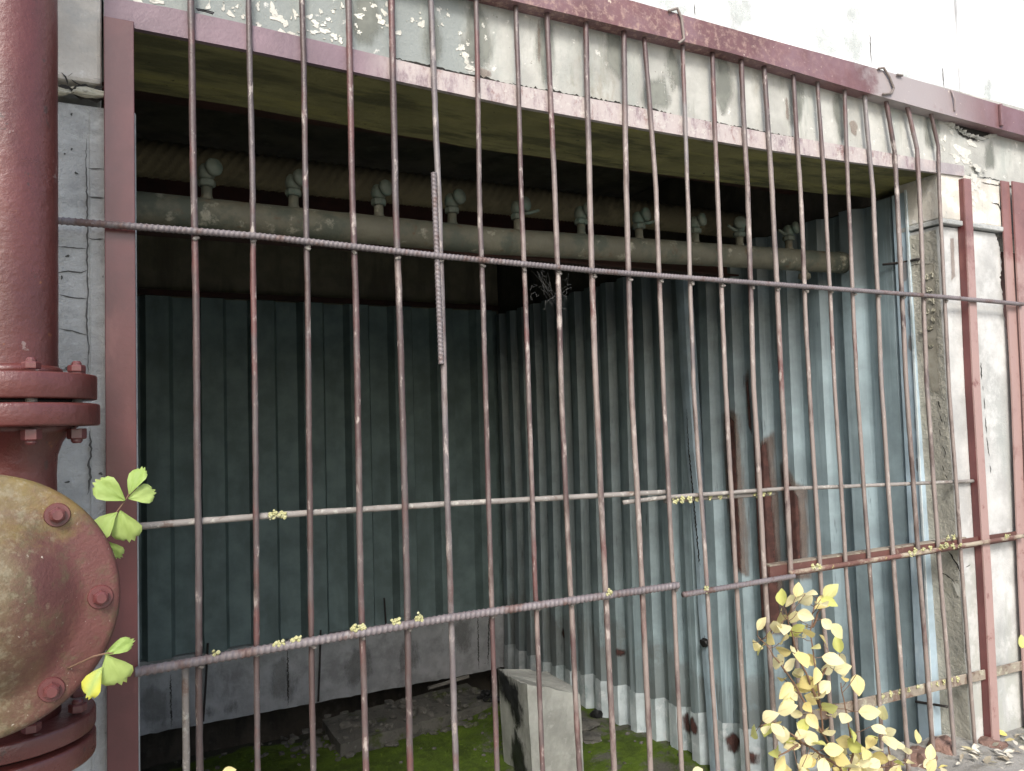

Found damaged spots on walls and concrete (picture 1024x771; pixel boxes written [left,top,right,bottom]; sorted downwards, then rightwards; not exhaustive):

peeling [456,31,475,72]
spalling [940,122,997,203]
crack [58,140,103,371]
corrosion [724,376,754,575]
corrosion [754,436,808,633]
corrosion [683,713,697,735]
corrosion [726,733,757,764]